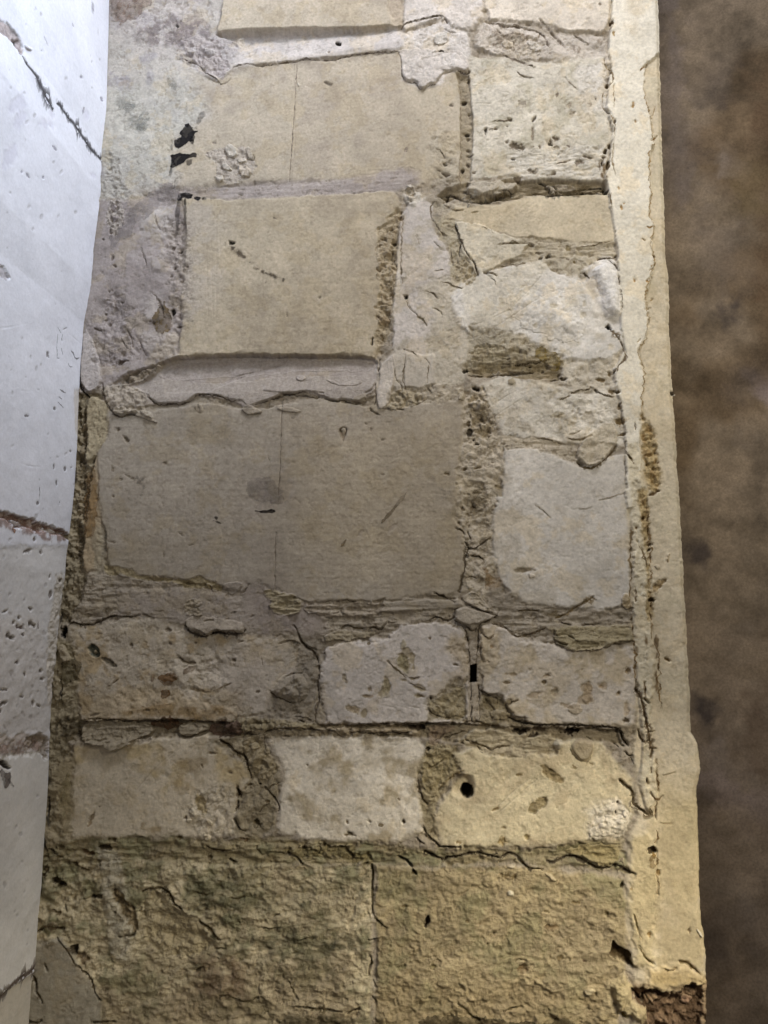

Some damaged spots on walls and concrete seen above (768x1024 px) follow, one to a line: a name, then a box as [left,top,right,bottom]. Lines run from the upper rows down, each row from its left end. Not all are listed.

peeling [398,32,471,90]
crack [179,14,532,326]
crack [83,493,674,1015]
crack [0,906,98,1024]
crack [458,1006,479,1020]
spalling [631,981,705,1024]